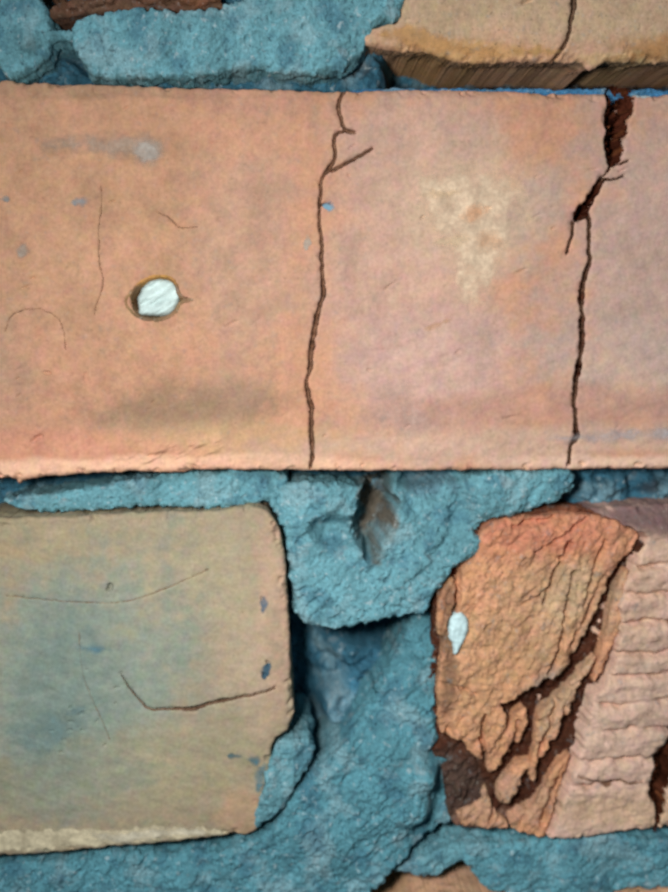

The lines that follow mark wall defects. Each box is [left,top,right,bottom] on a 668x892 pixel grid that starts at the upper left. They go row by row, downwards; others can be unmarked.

spalling [49,0,223,31]
crack [552,0,577,62]
crack [305,92,372,468]
crack [565,86,634,465]
crack [121,675,275,711]
spalling [428,500,644,838]
crack [579,738,668,833]